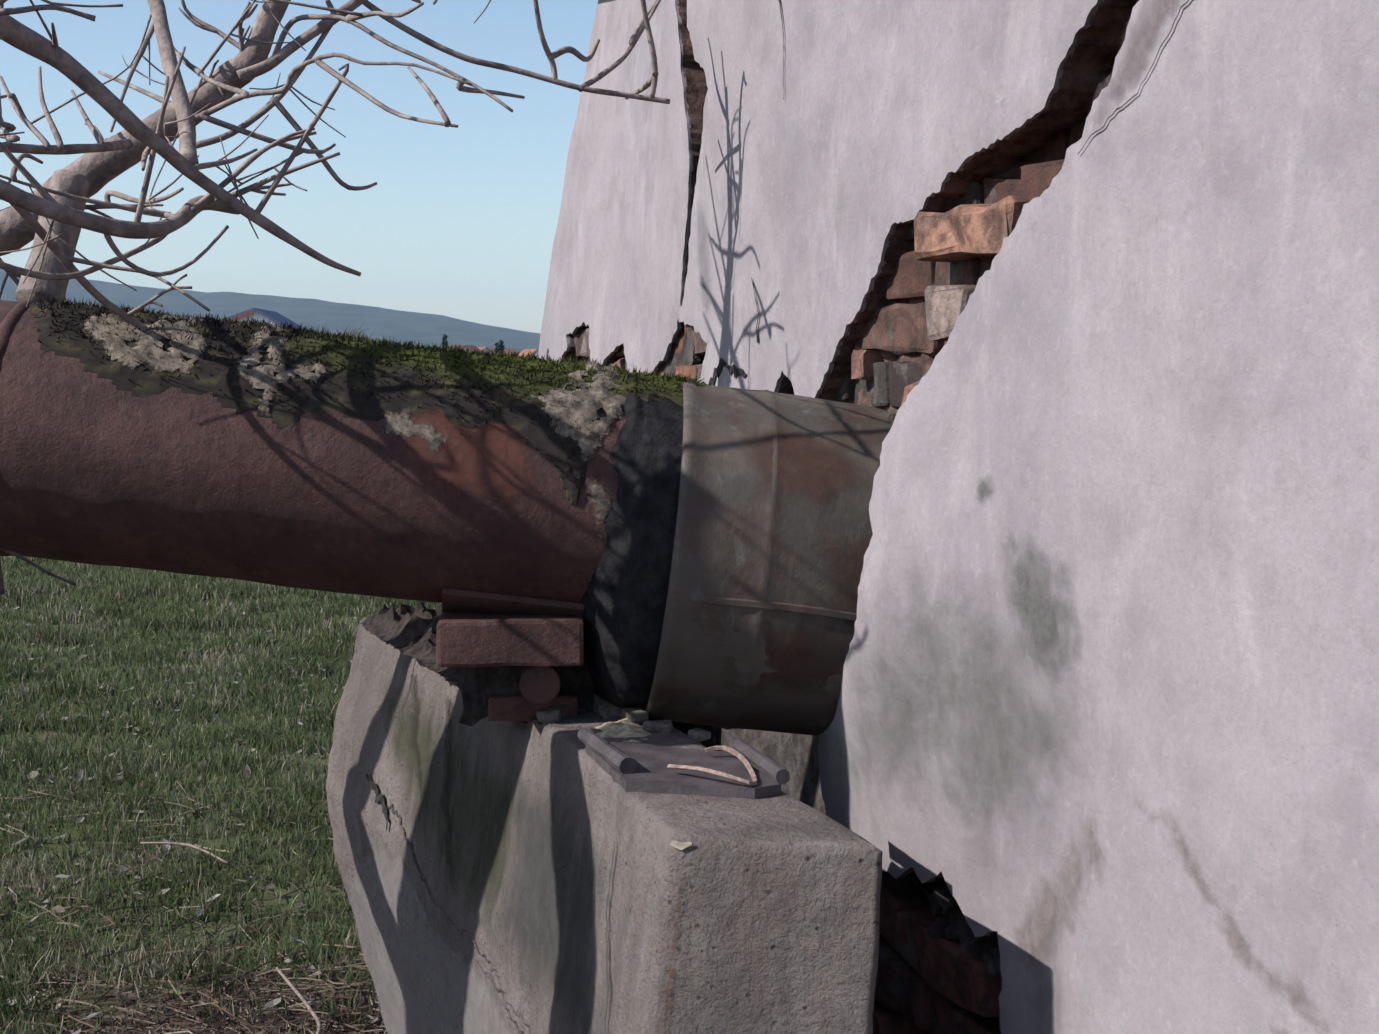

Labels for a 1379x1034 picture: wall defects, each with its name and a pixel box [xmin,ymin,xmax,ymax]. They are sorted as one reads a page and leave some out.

crack [777,0,785,99]
crack [678,0,708,279]
peeling [531,325,627,462]
peeling [654,323,707,381]
corrosion [405,413,527,494]
peeling [586,480,612,542]
leakage [1013,552,1067,667]
crack [366,773,529,1034]
spalling [873,871,1002,1034]